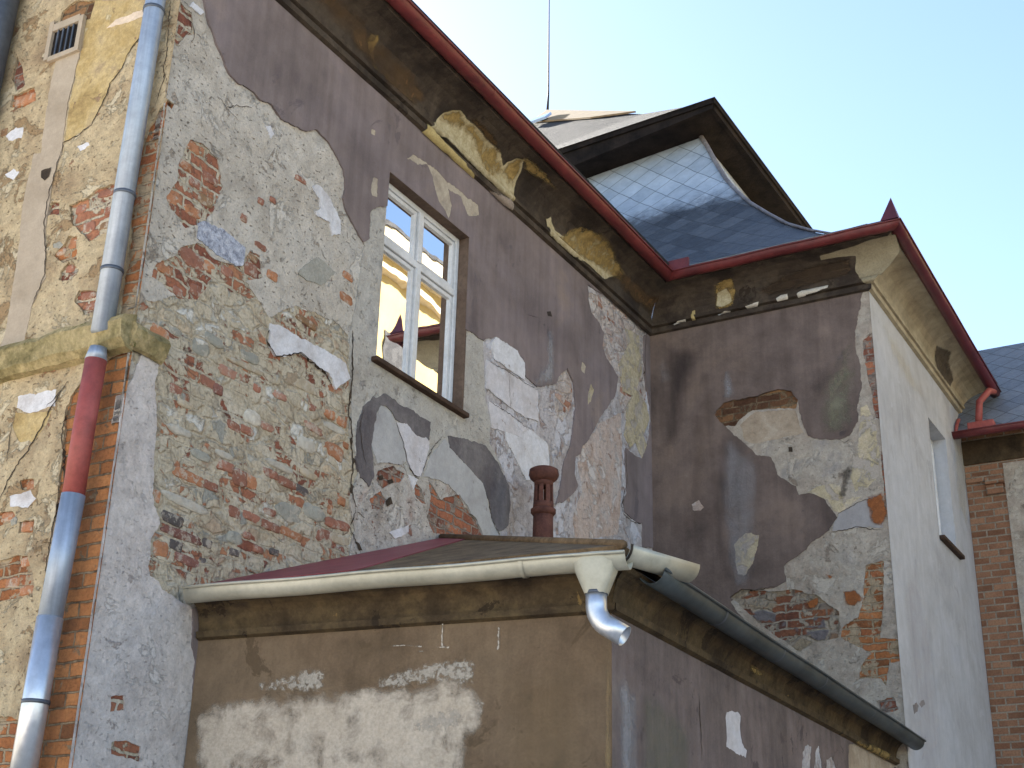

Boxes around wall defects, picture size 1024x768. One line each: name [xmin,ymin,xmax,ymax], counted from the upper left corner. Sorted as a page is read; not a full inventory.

crack [32,38,139,304]
spalling [38,0,653,768]
peeling [13,389,56,442]
crack [267,330,366,553]
spalling [0,479,36,533]
crack [0,382,67,585]
spalling [715,234,906,725]
spalling [0,556,34,602]
damp [260,670,324,691]
damp [379,662,473,687]
spalling [0,717,18,768]
peeling [726,711,747,758]